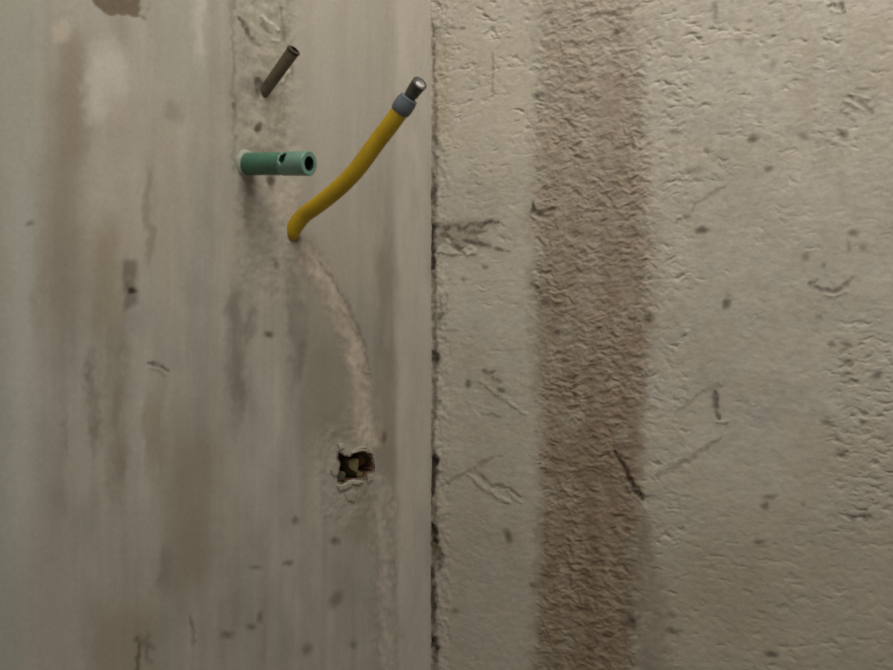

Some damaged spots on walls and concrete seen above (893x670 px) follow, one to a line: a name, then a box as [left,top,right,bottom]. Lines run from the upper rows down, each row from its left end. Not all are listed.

peeling [93,0,150,17]
spalling [329,443,375,502]
crack [614,451,643,497]